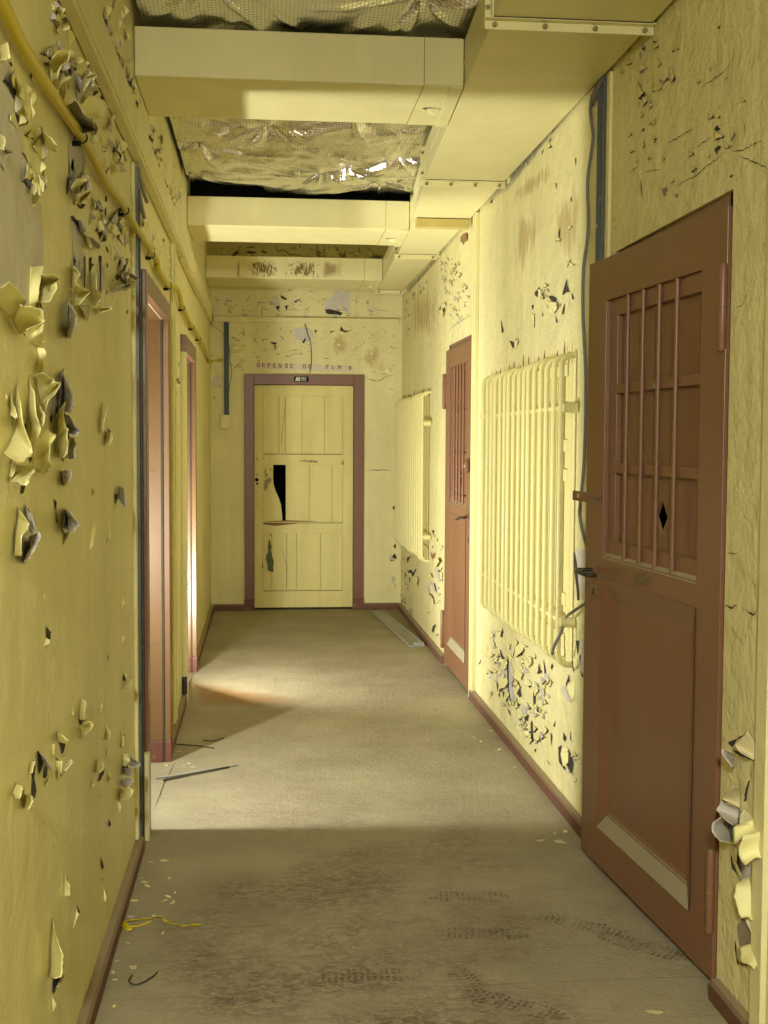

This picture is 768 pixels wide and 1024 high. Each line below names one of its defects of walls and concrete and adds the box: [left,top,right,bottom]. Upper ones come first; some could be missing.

peeling [621,41,676,161]
peeling [0,0,171,564]
peeling [215,281,427,372]
peeling [387,530,443,636]
peeling [574,547,586,600]
peeling [13,731,73,810]
peeling [71,697,141,826]
peeling [479,628,584,782]
peeling [721,731,755,767]
peeling [64,876,80,926]
peeling [712,775,761,969]
peeling [50,919,65,1013]